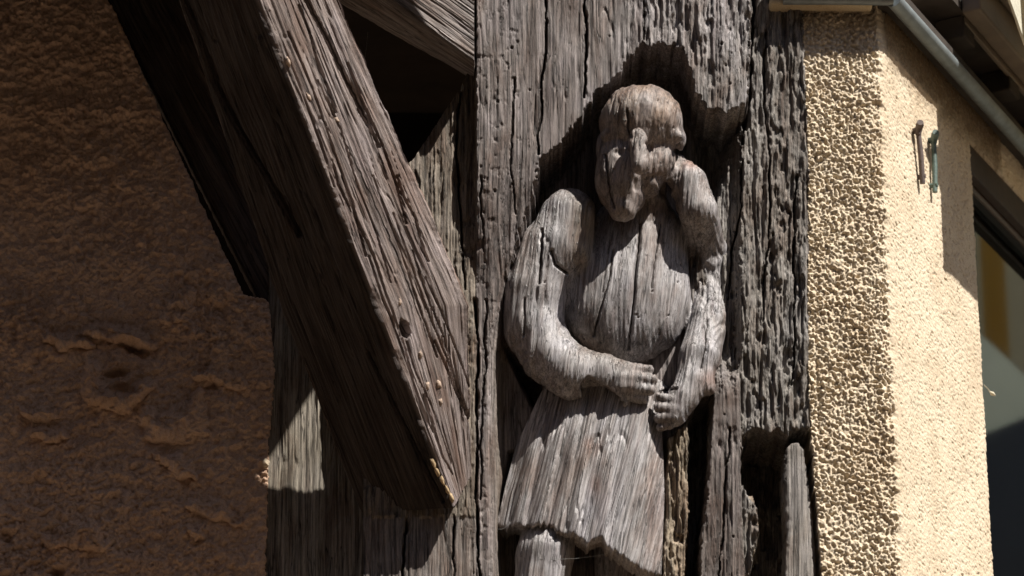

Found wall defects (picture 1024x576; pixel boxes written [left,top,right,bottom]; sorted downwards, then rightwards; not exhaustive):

crack [510,0,547,215]
crack [368,304,487,576]